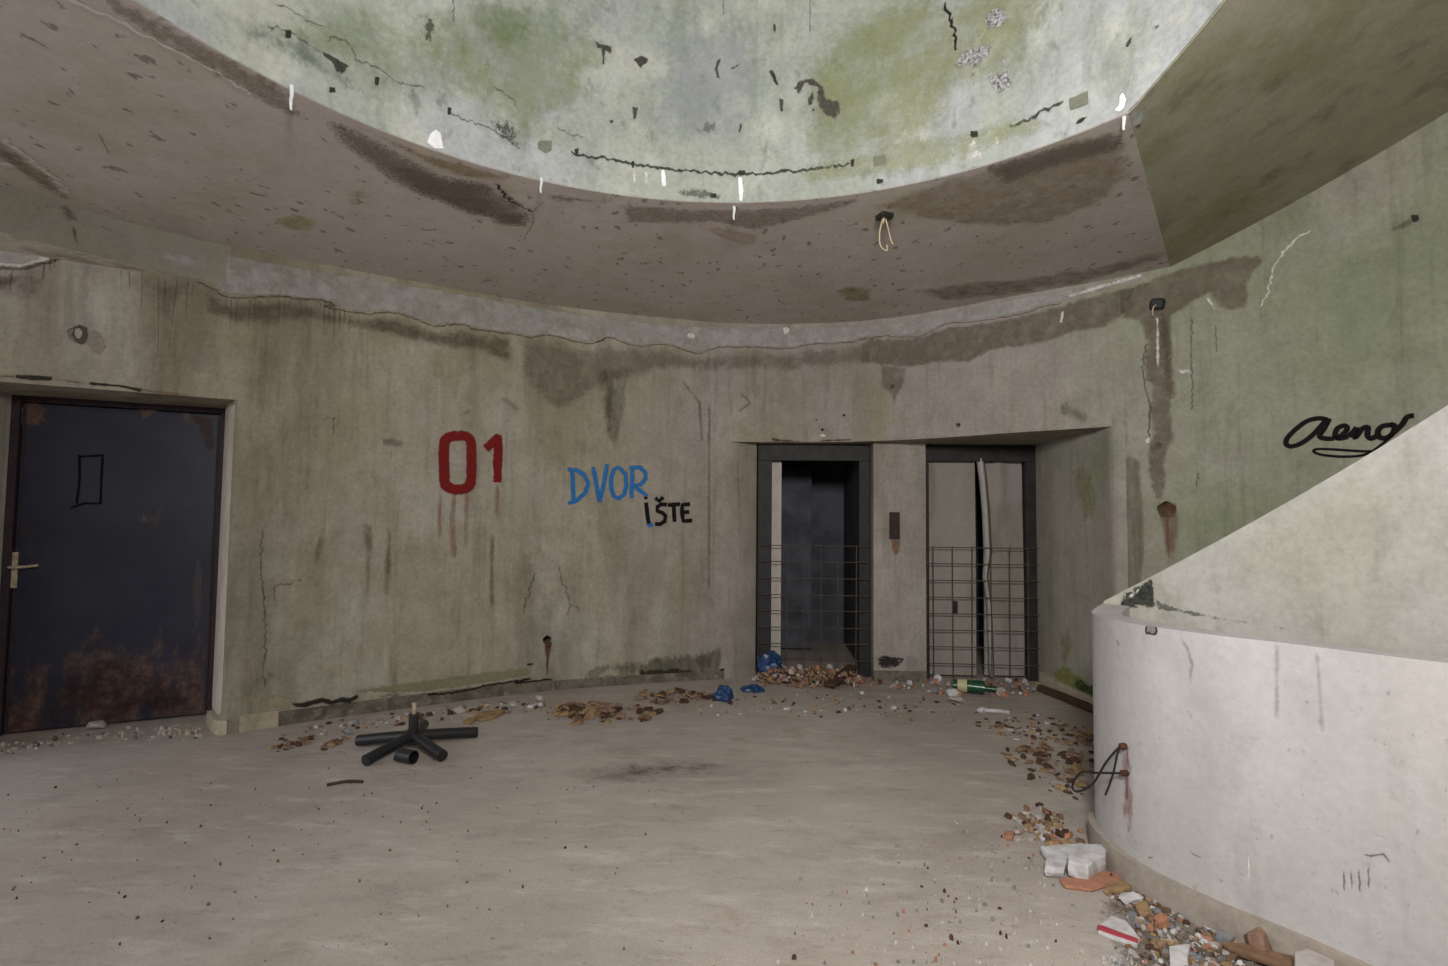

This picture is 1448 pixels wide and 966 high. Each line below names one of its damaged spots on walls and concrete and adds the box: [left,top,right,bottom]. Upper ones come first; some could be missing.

leakage [0,135,70,194]
leakage [327,121,529,226]
leakage [890,134,1125,223]
flaking render [0,251,52,268]
flaking render [216,258,1146,351]
leakage [202,230,1311,494]